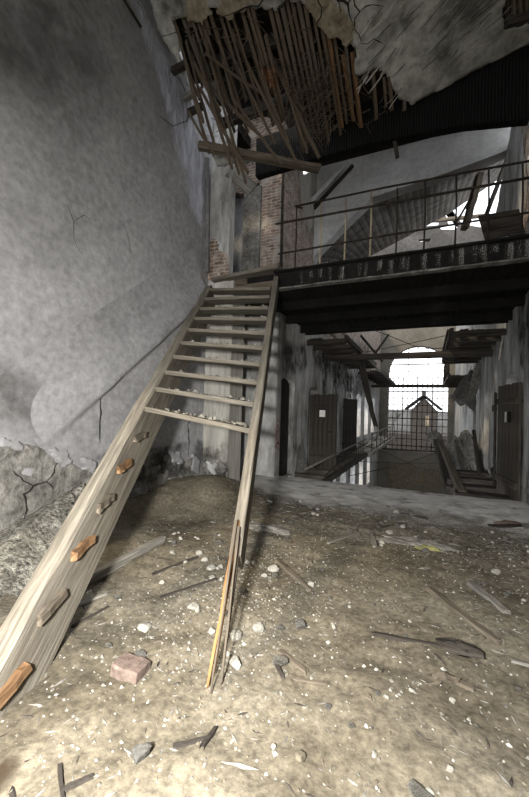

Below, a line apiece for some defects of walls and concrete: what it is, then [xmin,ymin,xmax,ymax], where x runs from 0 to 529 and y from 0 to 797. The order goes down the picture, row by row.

flaking render [185,0,260,25]
crack [213,0,287,22]
flaking render [305,0,356,47]
crack [317,0,383,44]
leakage [284,343,371,399]
spalling [0,437,97,531]
spalling [128,448,229,498]